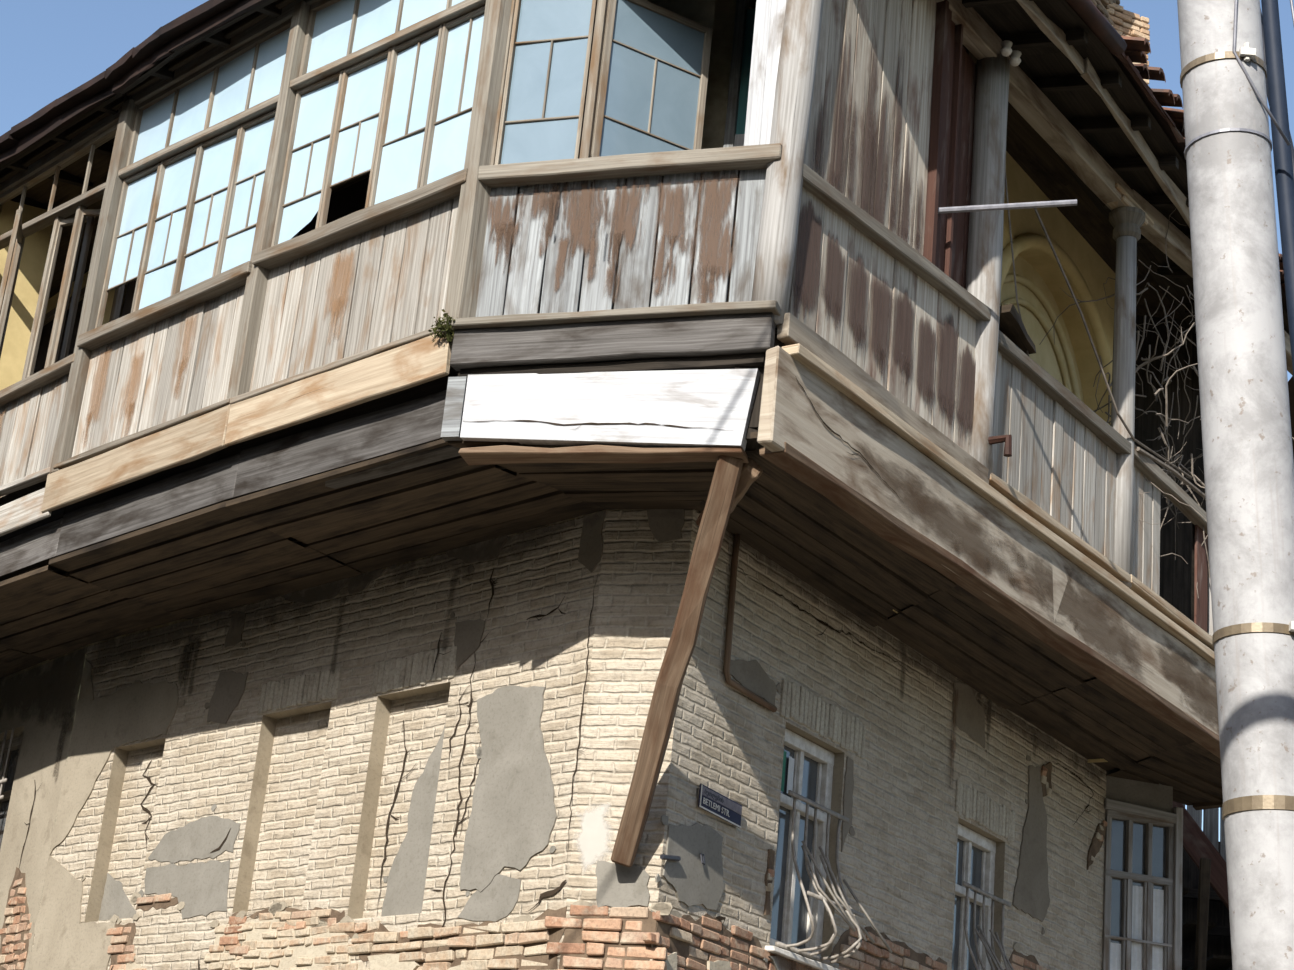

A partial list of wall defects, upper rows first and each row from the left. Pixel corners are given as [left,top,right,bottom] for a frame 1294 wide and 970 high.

crack [140,760,158,849]
crack [377,720,416,907]
crack [431,568,498,963]
crack [527,575,598,911]
spalling [1040,762,1052,797]
flaking render [0,867,35,970]
flaking render [106,889,185,970]
flaking render [204,900,776,970]
flaking render [830,926,947,970]
flaking render [1004,942,1050,970]